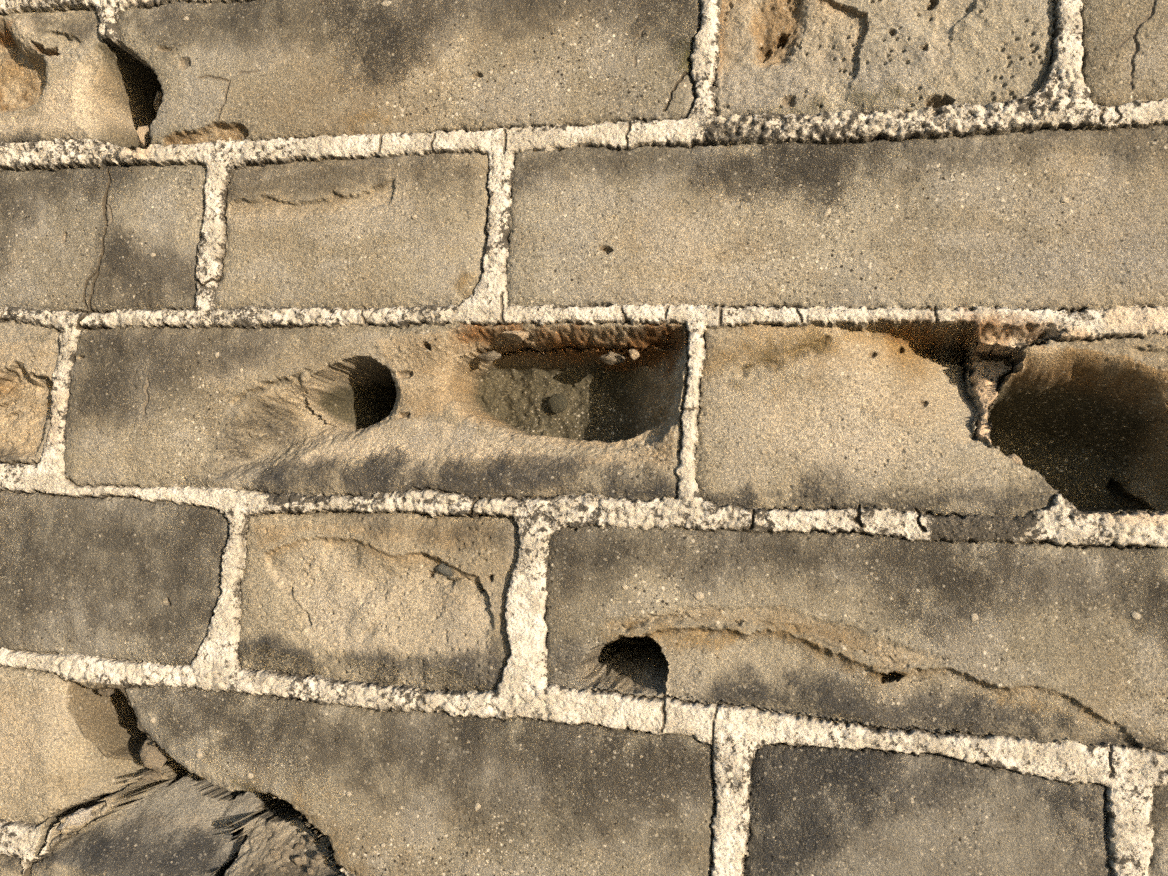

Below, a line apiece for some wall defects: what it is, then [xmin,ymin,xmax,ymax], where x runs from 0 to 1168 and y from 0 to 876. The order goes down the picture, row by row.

spalling [717,0,868,117]
crack [75,163,113,330]
spalling [0,358,53,462]
damp [195,403,678,502]
damp [706,471,1057,517]
spalling [639,627,1142,750]
crack [23,859,36,876]